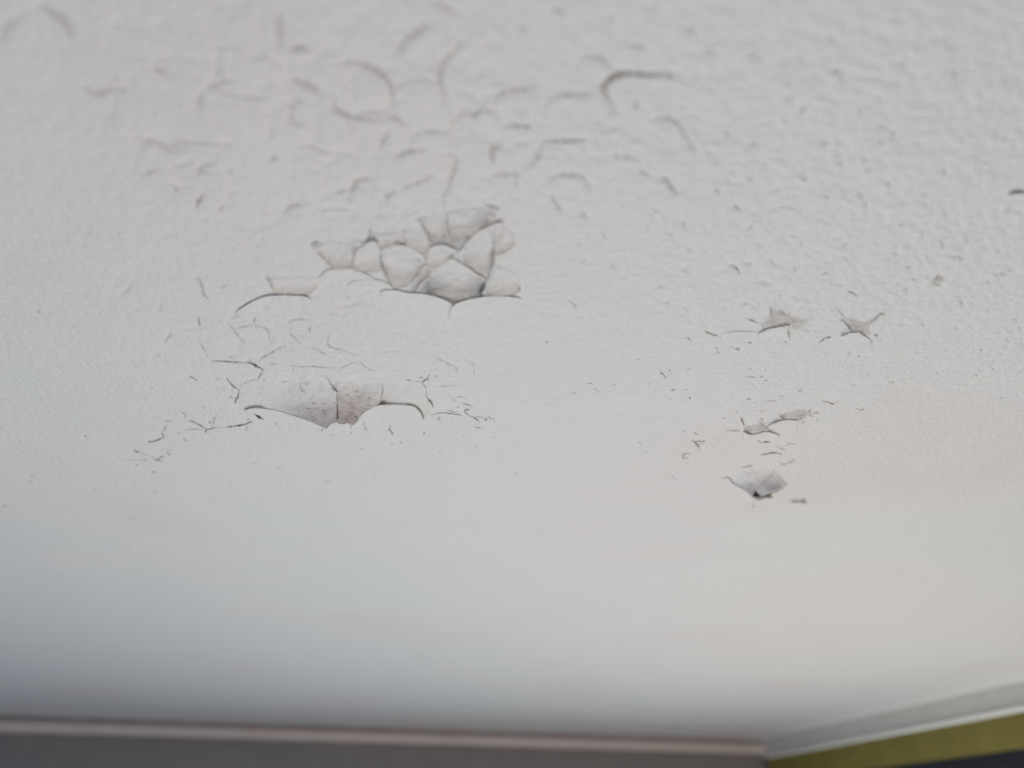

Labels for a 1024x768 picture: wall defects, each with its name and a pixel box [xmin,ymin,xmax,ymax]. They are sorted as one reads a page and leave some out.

peeling [721,311,804,339]
peeling [840,319,872,342]
peeling [238,378,433,431]
peeling [741,411,809,440]
peeling [723,466,788,503]